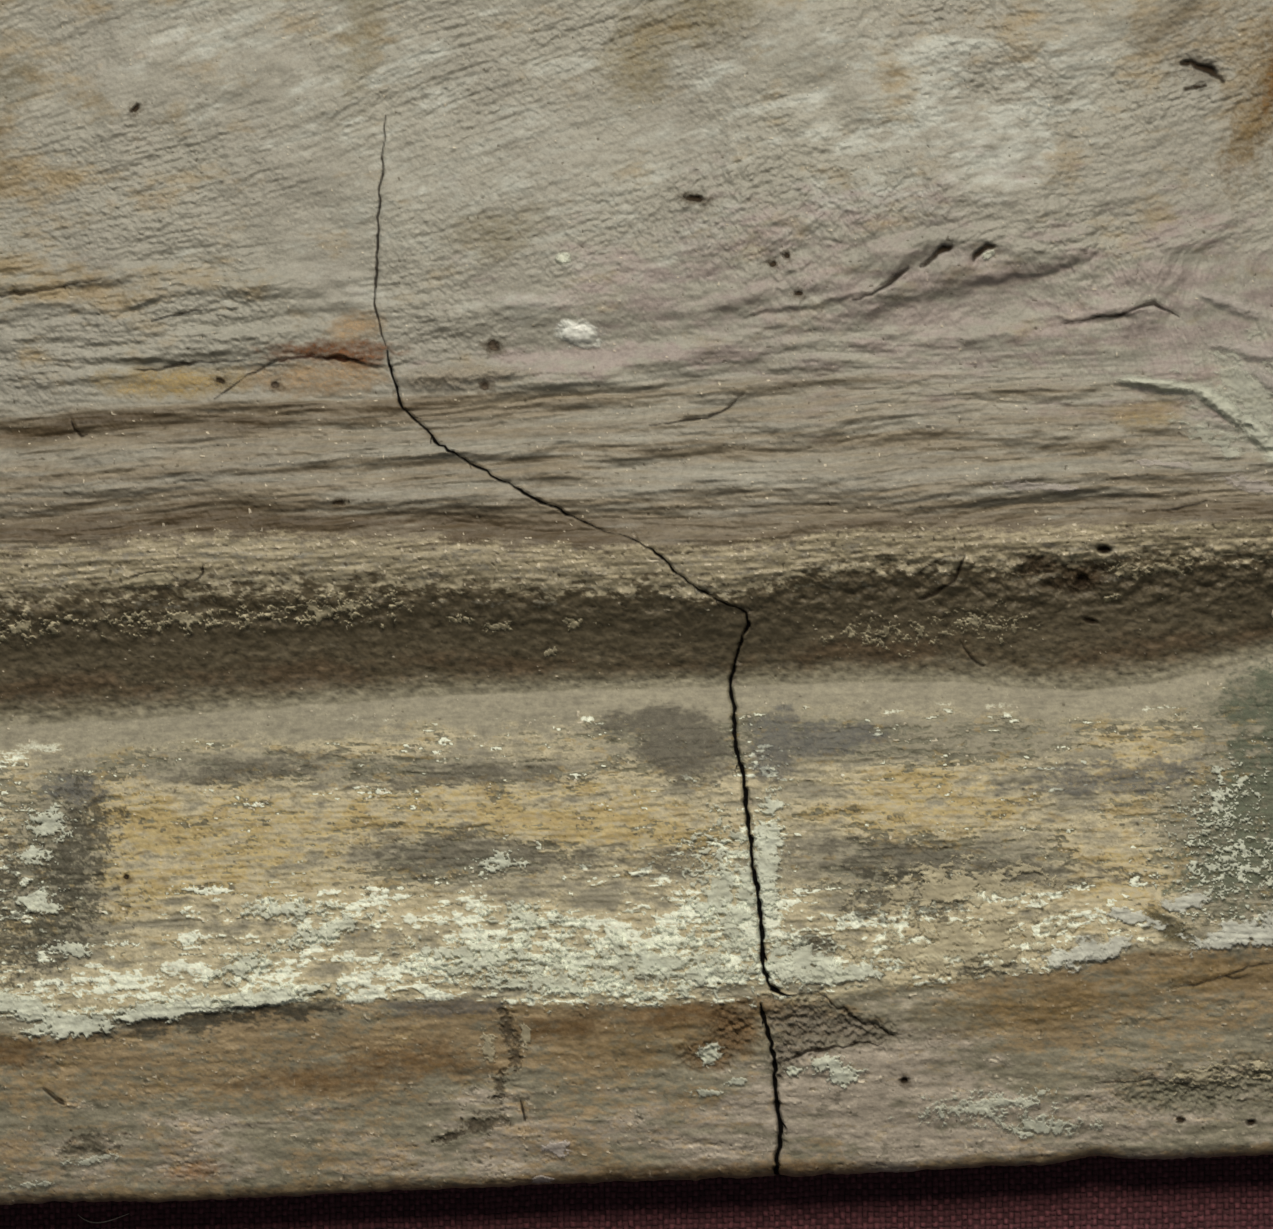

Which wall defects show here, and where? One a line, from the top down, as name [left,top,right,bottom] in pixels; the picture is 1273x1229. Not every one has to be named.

rust [257,315,386,391]
crack [132,125,818,1175]
damp [601,707,733,786]
damp [1028,758,1196,808]
damp [1163,666,1273,923]
damp [0,774,128,990]
damp [840,839,966,935]
damp [795,933,843,949]
damp [958,963,1014,977]
damp [100,998,342,1041]